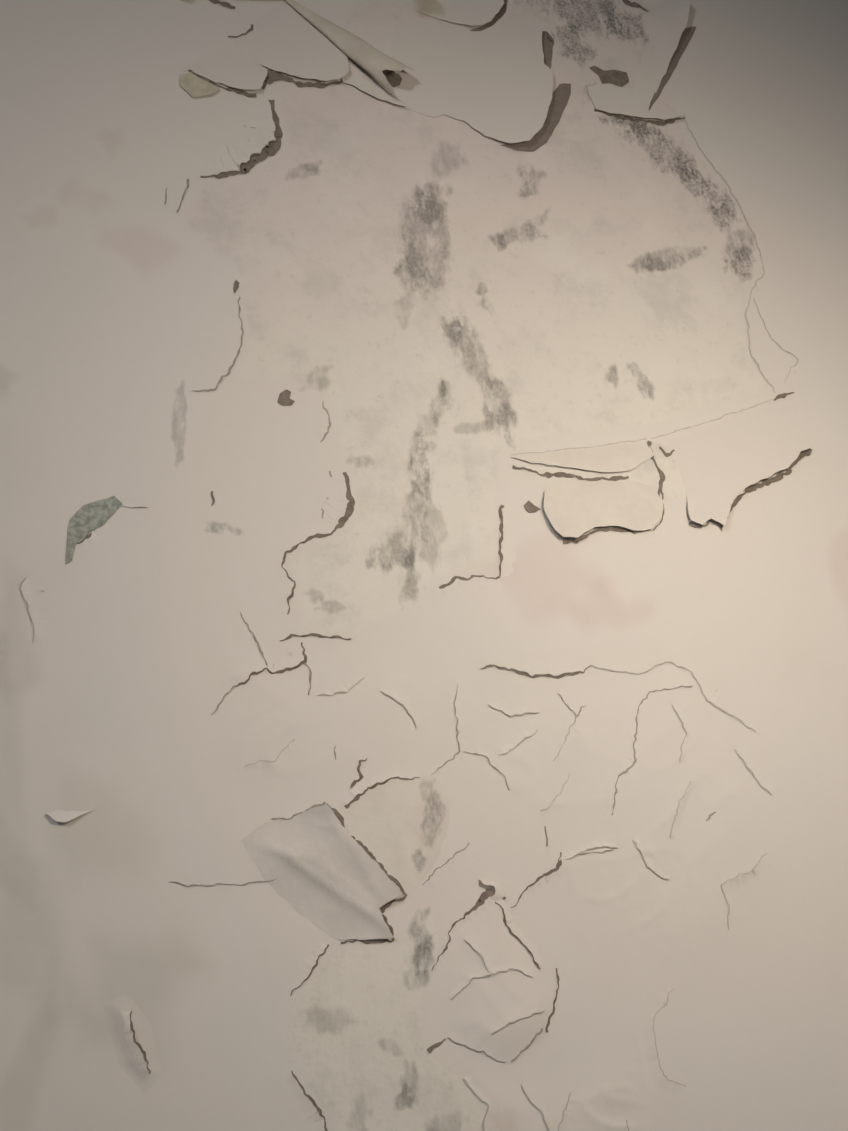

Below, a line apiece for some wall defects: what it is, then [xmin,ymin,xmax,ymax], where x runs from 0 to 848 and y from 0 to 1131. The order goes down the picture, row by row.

spalling [65,496,147,565]
crack [211,471,355,715]
crack [439,505,520,604]
peeling [177,0,813,641]
crack [512,465,629,481]
crack [563,441,812,544]
crack [773,392,794,401]
crack [476,641,782,815]
crack [271,746,420,996]
peeling [241,777,520,1131]
crack [427,826,617,1063]
crack [115,1009,151,1076]